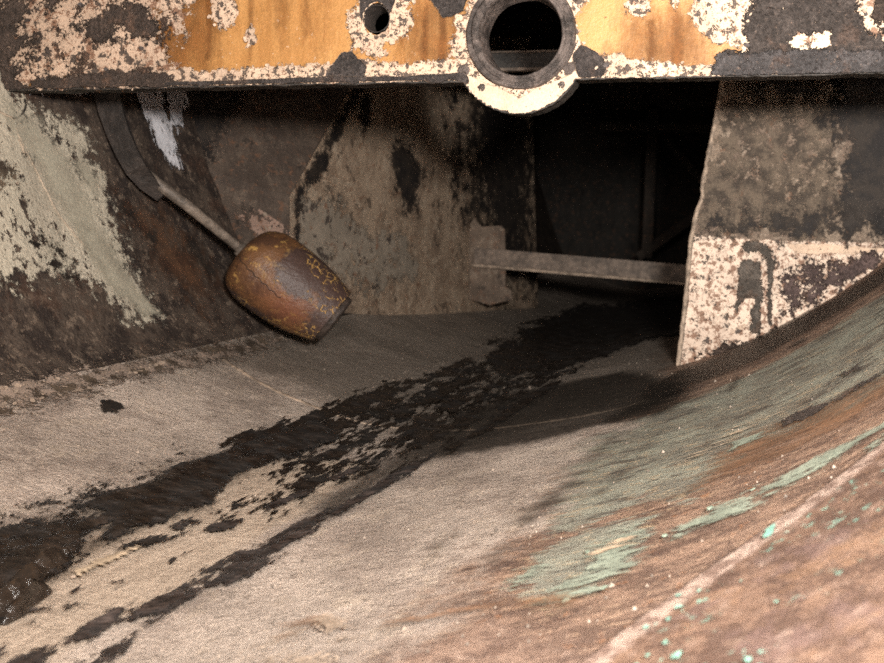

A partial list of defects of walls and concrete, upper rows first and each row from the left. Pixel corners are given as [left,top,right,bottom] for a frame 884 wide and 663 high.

peeling [0,0,884,299]
leakage [693,161,884,244]
leakage [78,224,155,315]
peeling [681,235,884,365]
leakage [0,267,884,663]